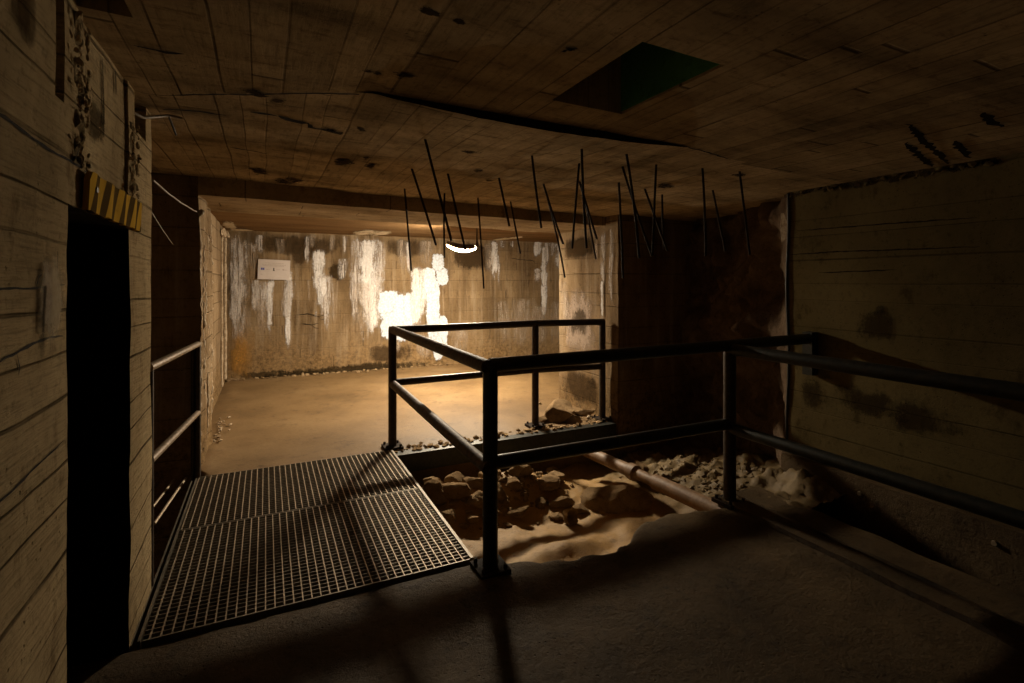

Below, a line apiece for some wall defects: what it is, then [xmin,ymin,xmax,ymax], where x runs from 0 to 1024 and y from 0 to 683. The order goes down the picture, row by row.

spalling [73,10,93,172]
spalling [129,121,142,199]
water stain [199,219,523,437]
spalling [404,139,466,271]
spalling [477,198,485,289]
spalling [475,170,521,254]
water stain [498,231,613,350]
spalling [531,149,598,278]
spalling [618,154,673,278]